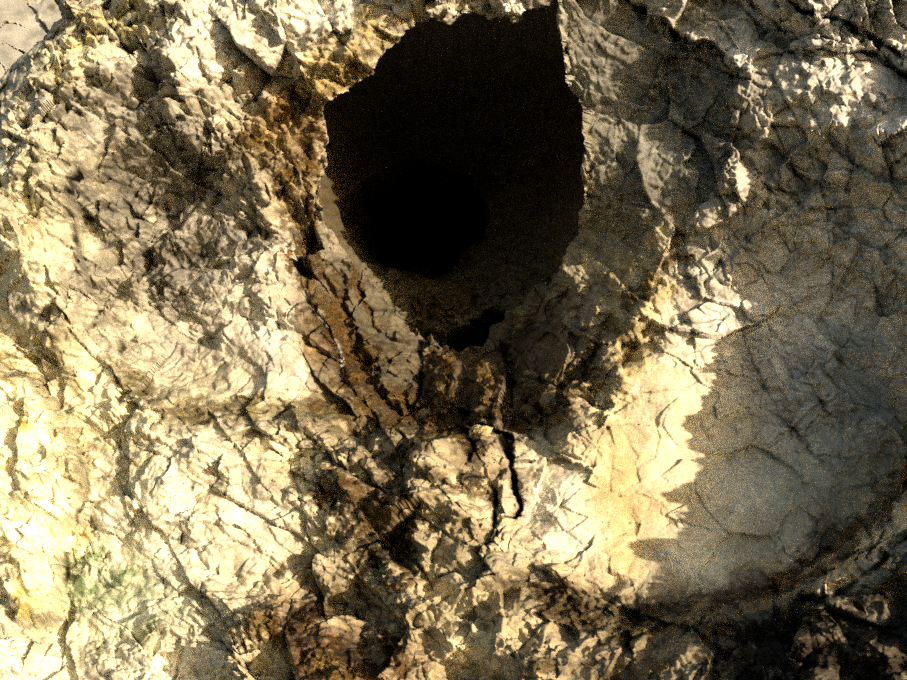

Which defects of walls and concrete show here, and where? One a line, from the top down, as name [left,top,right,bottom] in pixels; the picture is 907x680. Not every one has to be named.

peeling [292,10,330,38]
crack [667,22,751,80]
crack [748,1,781,31]
crack [790,1,907,78]
crack [412,340,424,410]
damp [280,236,696,498]
crack [500,342,513,402]
crack [440,408,532,536]
damp [307,465,420,605]
damp [515,570,587,626]
damp [766,539,859,598]